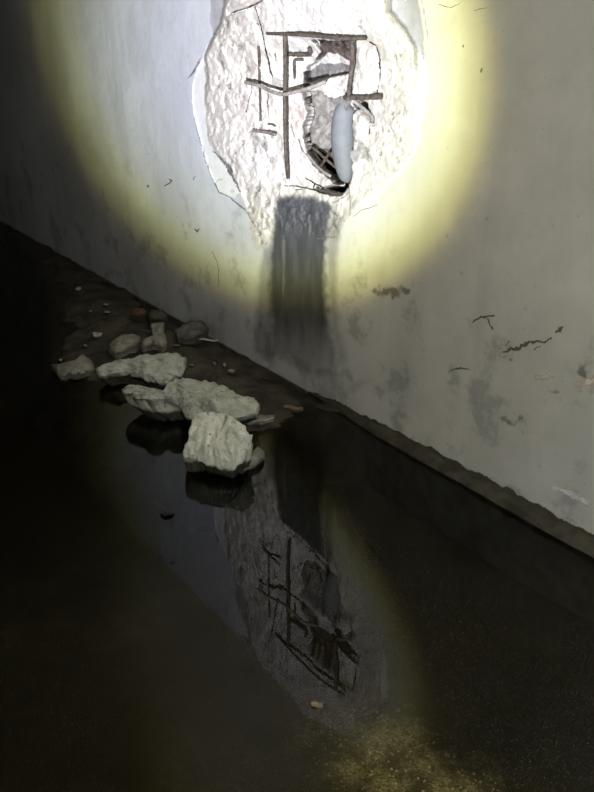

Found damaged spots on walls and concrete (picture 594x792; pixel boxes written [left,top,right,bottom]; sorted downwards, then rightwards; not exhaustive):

corrosion [316,40,356,61]
spalling [188,0,429,256]
water stain [270,197,329,342]
water stain [373,288,410,299]
crack [473,315,495,330]
crack [502,326,564,353]